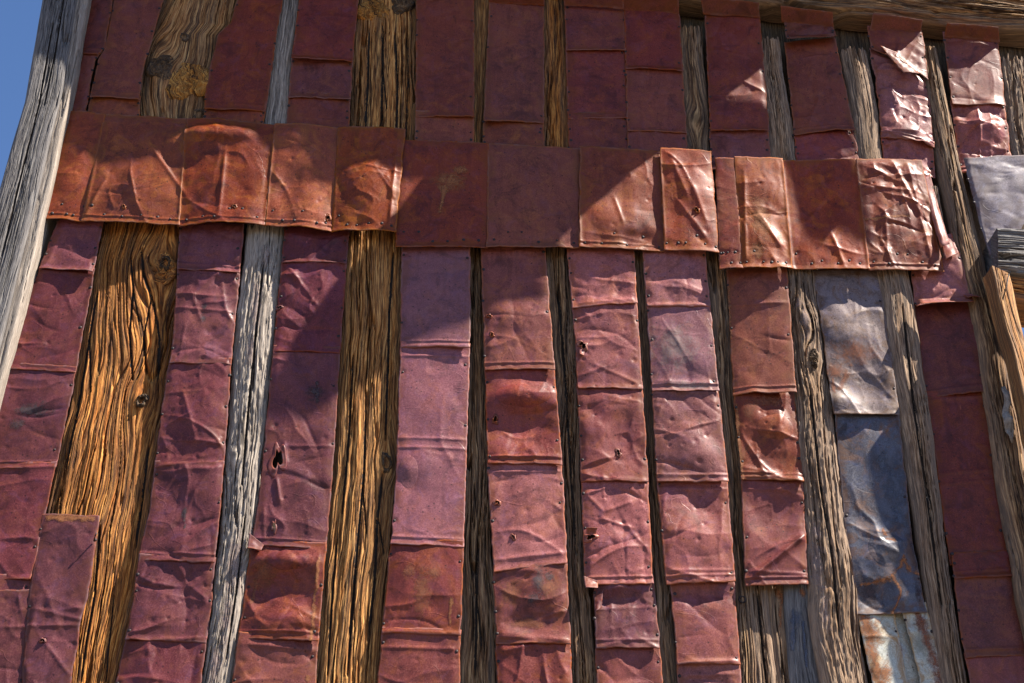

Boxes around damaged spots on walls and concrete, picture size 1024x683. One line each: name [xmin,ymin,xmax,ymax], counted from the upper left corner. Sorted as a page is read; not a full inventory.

rust [860,554,919,614]
rust [859,615,891,683]
rust [915,613,942,683]